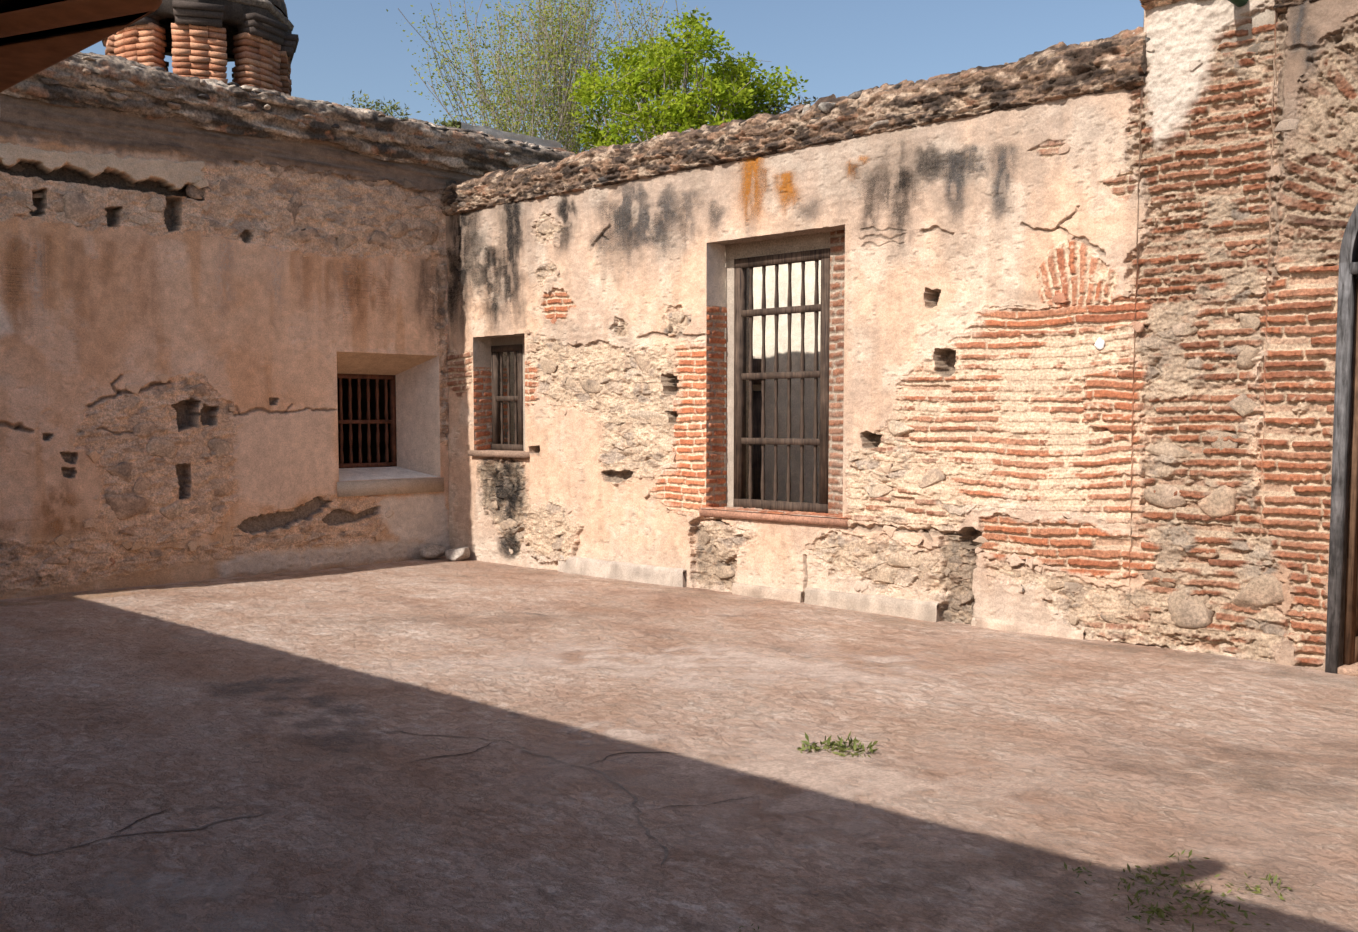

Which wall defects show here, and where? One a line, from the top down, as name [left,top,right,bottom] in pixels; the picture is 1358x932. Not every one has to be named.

spalling [0,158,473,446]
water stain [418,202,523,320]
water stain [558,197,575,243]
water stain [604,180,691,250]
water stain [866,147,1013,232]
crack [1019,205,1106,259]
spalling [804,0,1358,669]
crack [0,420,35,434]
crack [85,373,173,437]
crack [233,403,338,417]
spalling [521,213,758,592]
spalling [0,370,394,596]